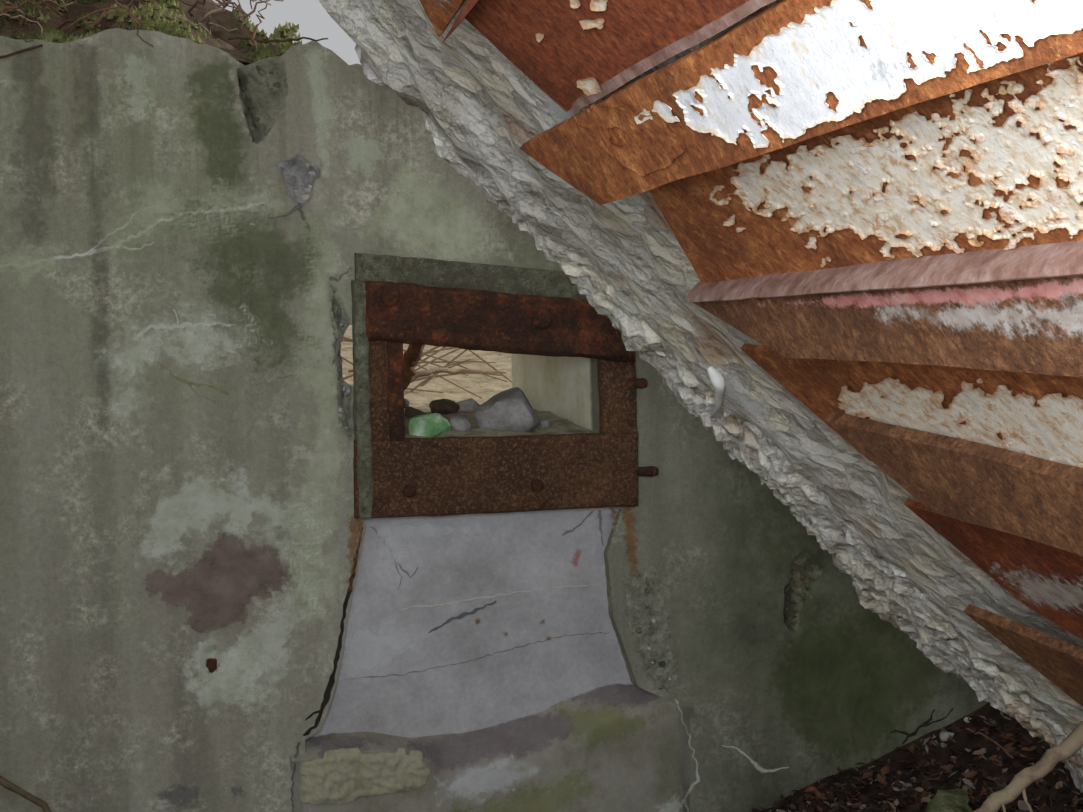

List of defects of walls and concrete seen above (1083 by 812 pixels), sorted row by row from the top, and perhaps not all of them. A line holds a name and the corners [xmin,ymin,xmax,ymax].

peeling [569,0,1083,267]
peeling [837,377,1083,468]
crack [291,525,607,812]